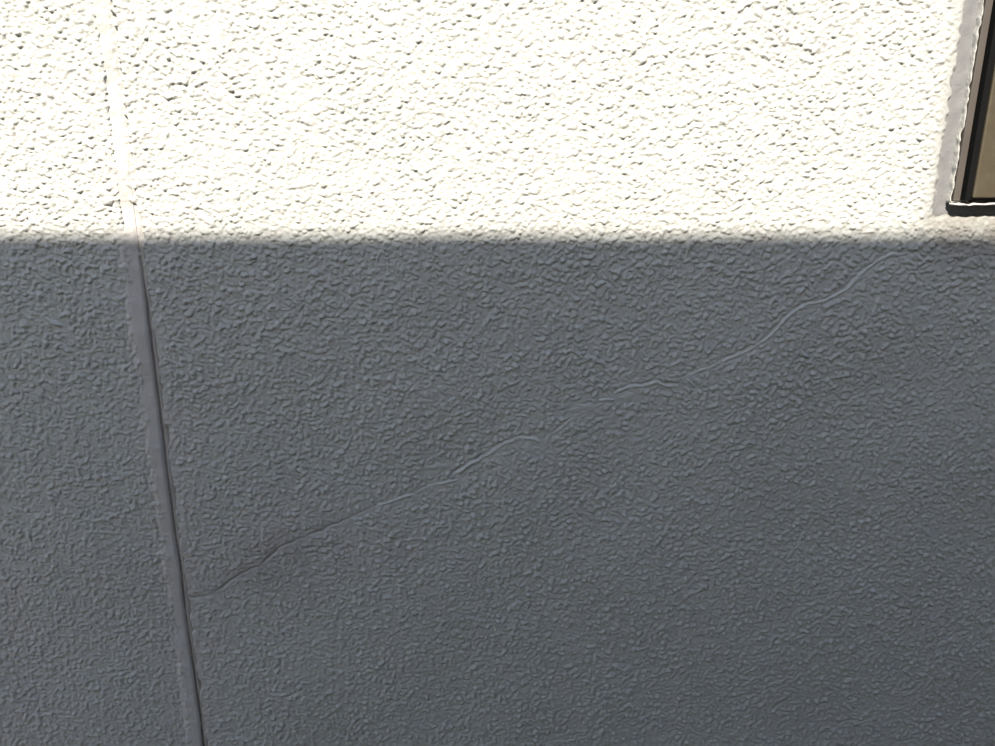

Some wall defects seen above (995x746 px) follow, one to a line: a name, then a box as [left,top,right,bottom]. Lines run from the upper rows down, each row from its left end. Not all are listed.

crack [131,187,906,746]